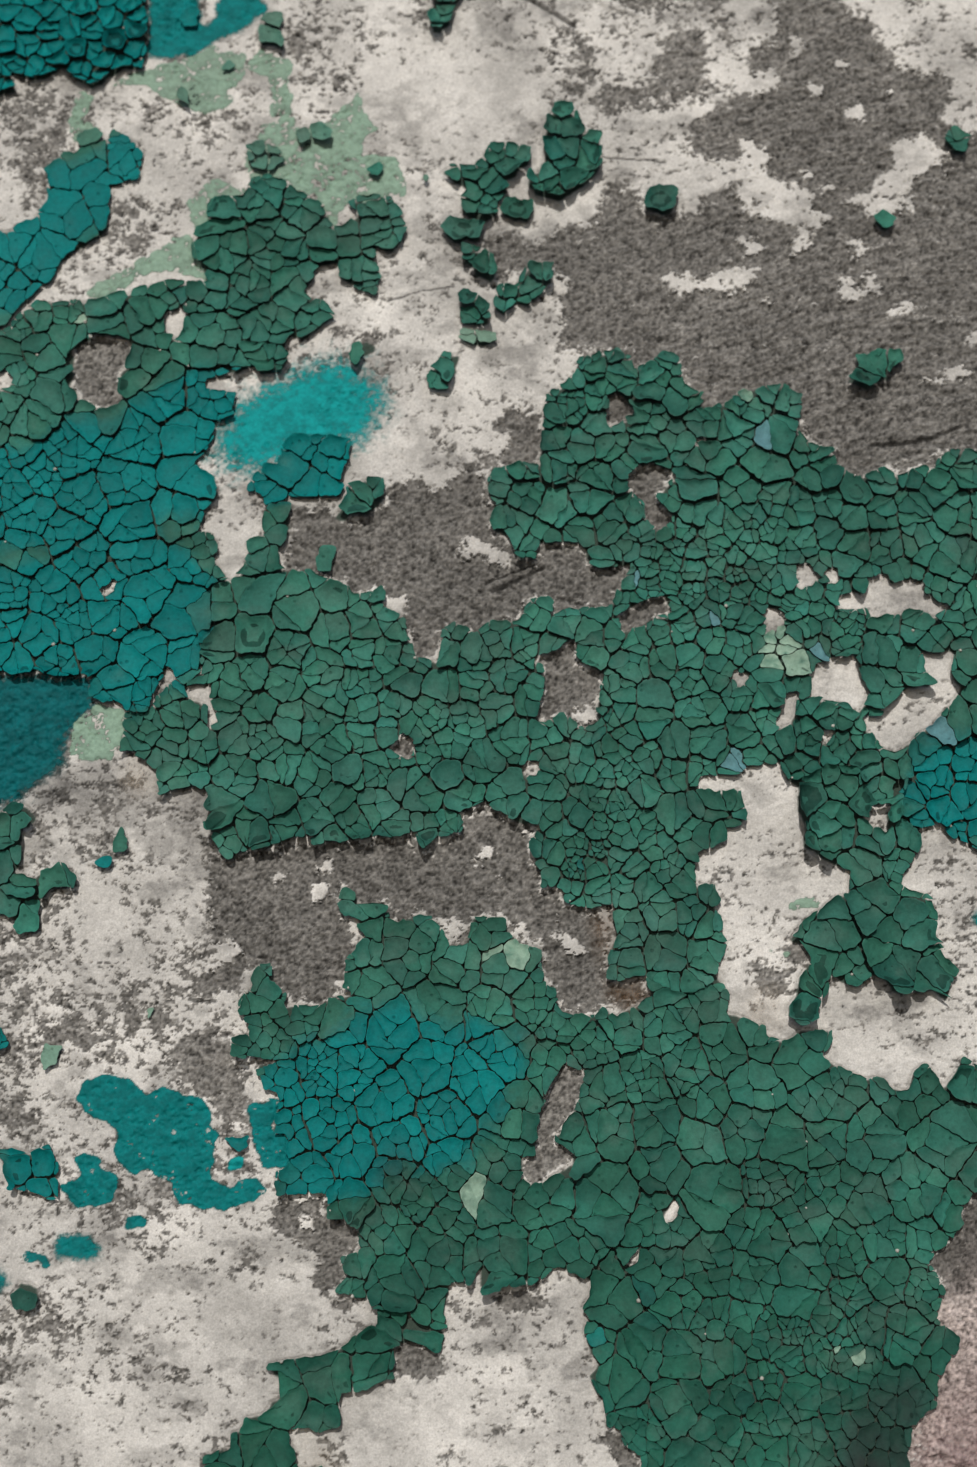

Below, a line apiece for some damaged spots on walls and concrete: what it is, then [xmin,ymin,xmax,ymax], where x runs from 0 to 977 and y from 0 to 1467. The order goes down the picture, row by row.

peeling [258,11,284,47]
peeling [296,121,332,143]
peeling [444,141,534,219]
peeling [356,193,407,258]
peeling [440,215,485,240]
spalling [458,0,977,530]
peeling [0,173,382,576]
peeling [426,351,455,390]
crack [870,423,965,448]
crack [485,565,546,593]
peeling [0,433,977,1467]
crack [188,995,218,1003]